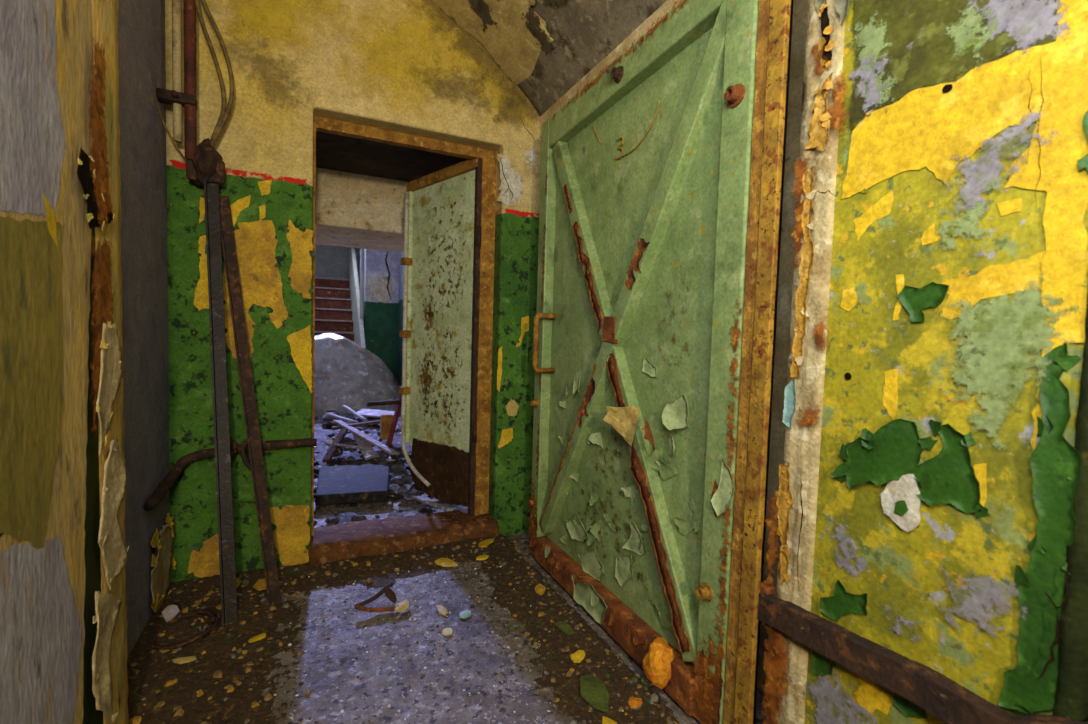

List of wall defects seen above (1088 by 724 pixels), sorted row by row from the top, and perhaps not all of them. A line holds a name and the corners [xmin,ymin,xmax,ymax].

damp [358,0,539,120]
peeling [432,0,553,85]
damp [522,9,564,55]
peeling [223,180,315,394]
rust [563,184,603,331]
rust [624,238,650,290]
peeling [0,0,129,724]
peeling [830,0,1088,724]
rust [528,353,626,556]
peeling [270,505,312,566]
rust [630,438,732,724]
rust [762,625,792,724]